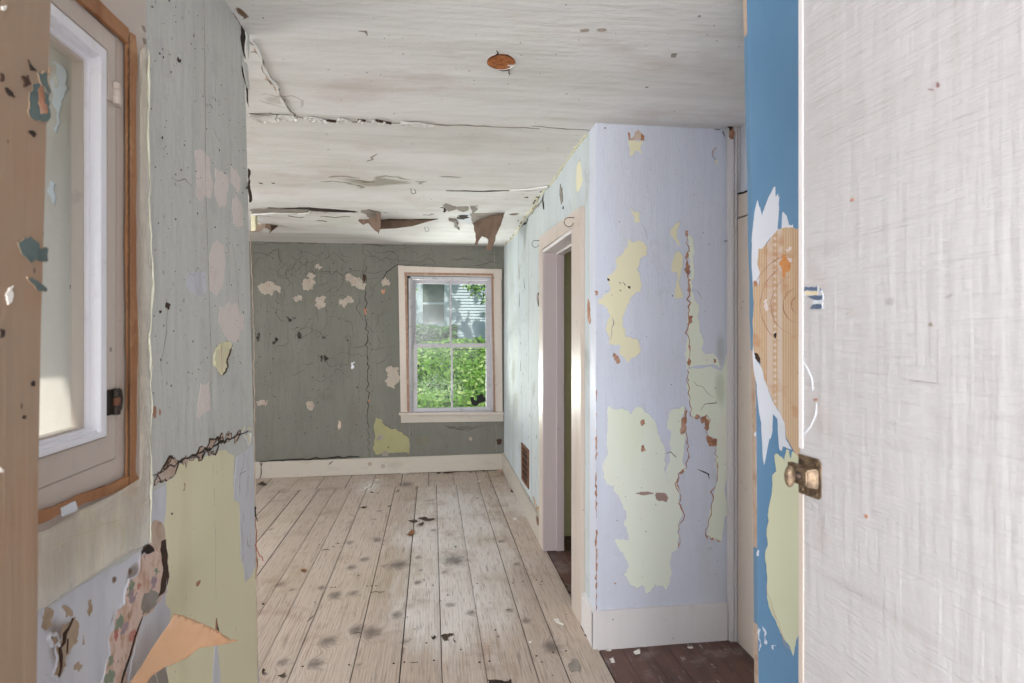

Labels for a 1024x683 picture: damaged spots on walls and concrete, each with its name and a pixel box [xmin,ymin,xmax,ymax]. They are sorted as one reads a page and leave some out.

peeling [0,59,68,138]
crack [203,0,591,131]
peeling [5,286,14,305]
peeling [17,235,48,263]
crack [172,82,519,548]
peeling [442,203,478,215]
peeling [779,247,792,278]
peeling [353,415,410,456]
peeling [587,221,727,594]
peeling [36,542,149,683]
peeling [126,425,270,683]
peeling [756,447,799,656]